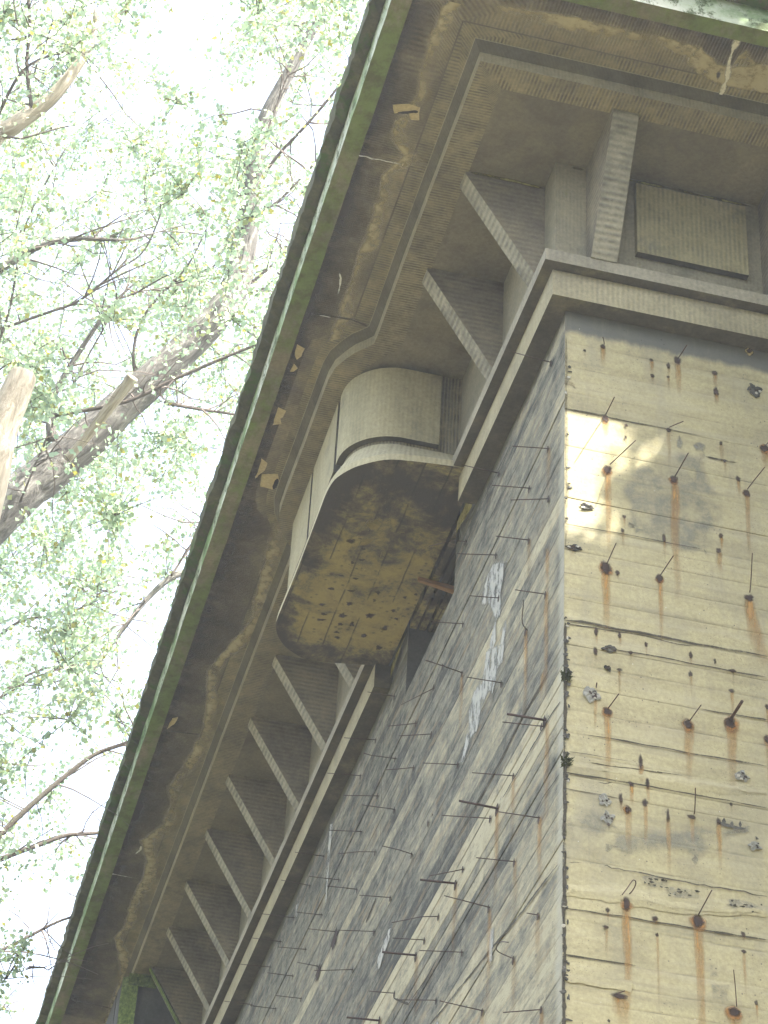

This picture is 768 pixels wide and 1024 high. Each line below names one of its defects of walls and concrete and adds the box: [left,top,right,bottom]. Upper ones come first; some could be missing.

water stain [497,0,768,67]
water stain [329,1,461,341]
spalling [747,383,763,398]
rust [603,465,612,499]
water stain [65,0,422,1023]
rust [600,561,620,602]
spalling [583,686,602,703]
rust [592,691,612,739]
rust [724,716,738,747]
spalling [598,793,615,825]
rust [606,897,632,965]
rust [691,915,706,974]